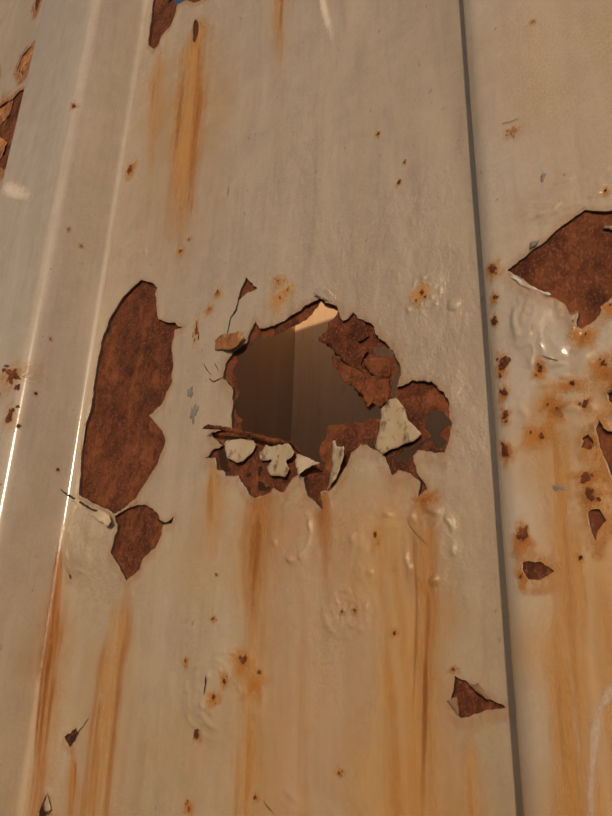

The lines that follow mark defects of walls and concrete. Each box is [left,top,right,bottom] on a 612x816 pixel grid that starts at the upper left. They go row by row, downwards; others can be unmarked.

corrosion [486,210,612,347]
peeling [2,364,21,391]
peeling [319,314,421,454]
corrosion [496,352,511,424]
corrosion [524,355,612,449]
peeling [224,439,294,477]
peeling [327,440,344,490]
corrosion [513,523,536,555]
peeling [518,554,555,592]
corrosion [543,397,612,816]
corrosion [37,556,61,783]
peeling [447,676,506,718]